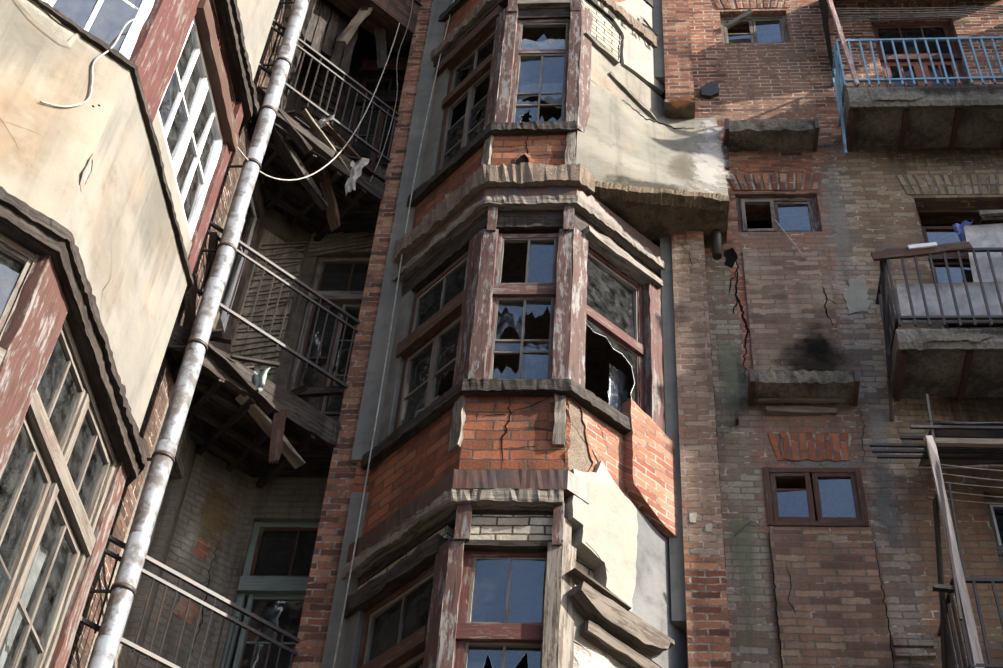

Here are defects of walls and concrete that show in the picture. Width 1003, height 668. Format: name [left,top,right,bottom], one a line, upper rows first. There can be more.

peeling [693,119,728,191]
crack [671,238,750,373]
crack [822,286,836,325]
crack [482,398,608,468]
spalling [564,398,595,472]